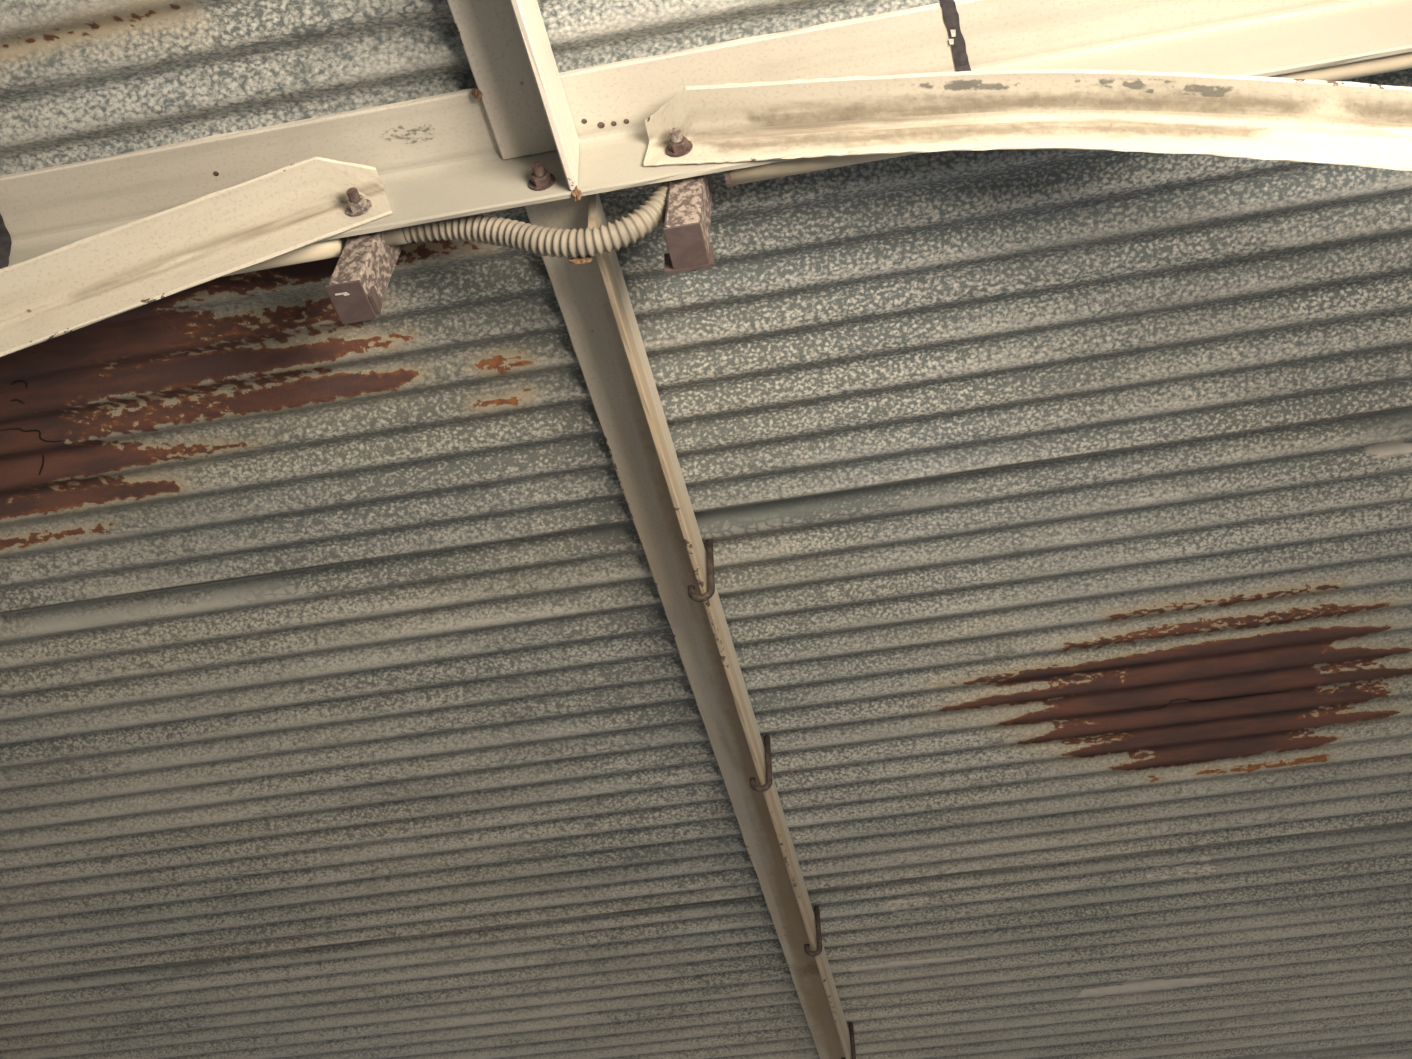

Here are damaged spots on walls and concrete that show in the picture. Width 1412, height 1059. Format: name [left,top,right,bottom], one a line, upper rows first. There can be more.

corrosion [0,0,189,54]
corrosion [395,239,489,267]
corrosion [475,351,533,374]
corrosion [0,257,421,550]
corrosion [472,389,531,411]
corrosion [940,582,1412,782]